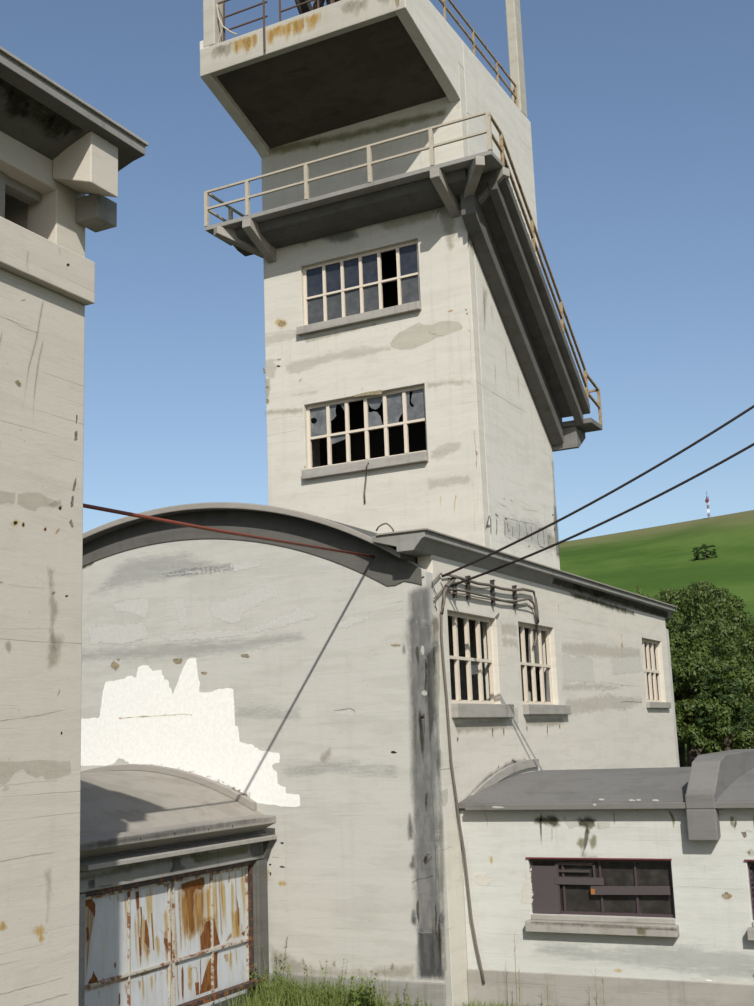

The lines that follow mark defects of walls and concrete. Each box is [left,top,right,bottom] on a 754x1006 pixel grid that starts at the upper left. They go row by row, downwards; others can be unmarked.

leakage [538,817,610,829]
corrosion [136,891,172,960]
corrosion [181,877,220,997]